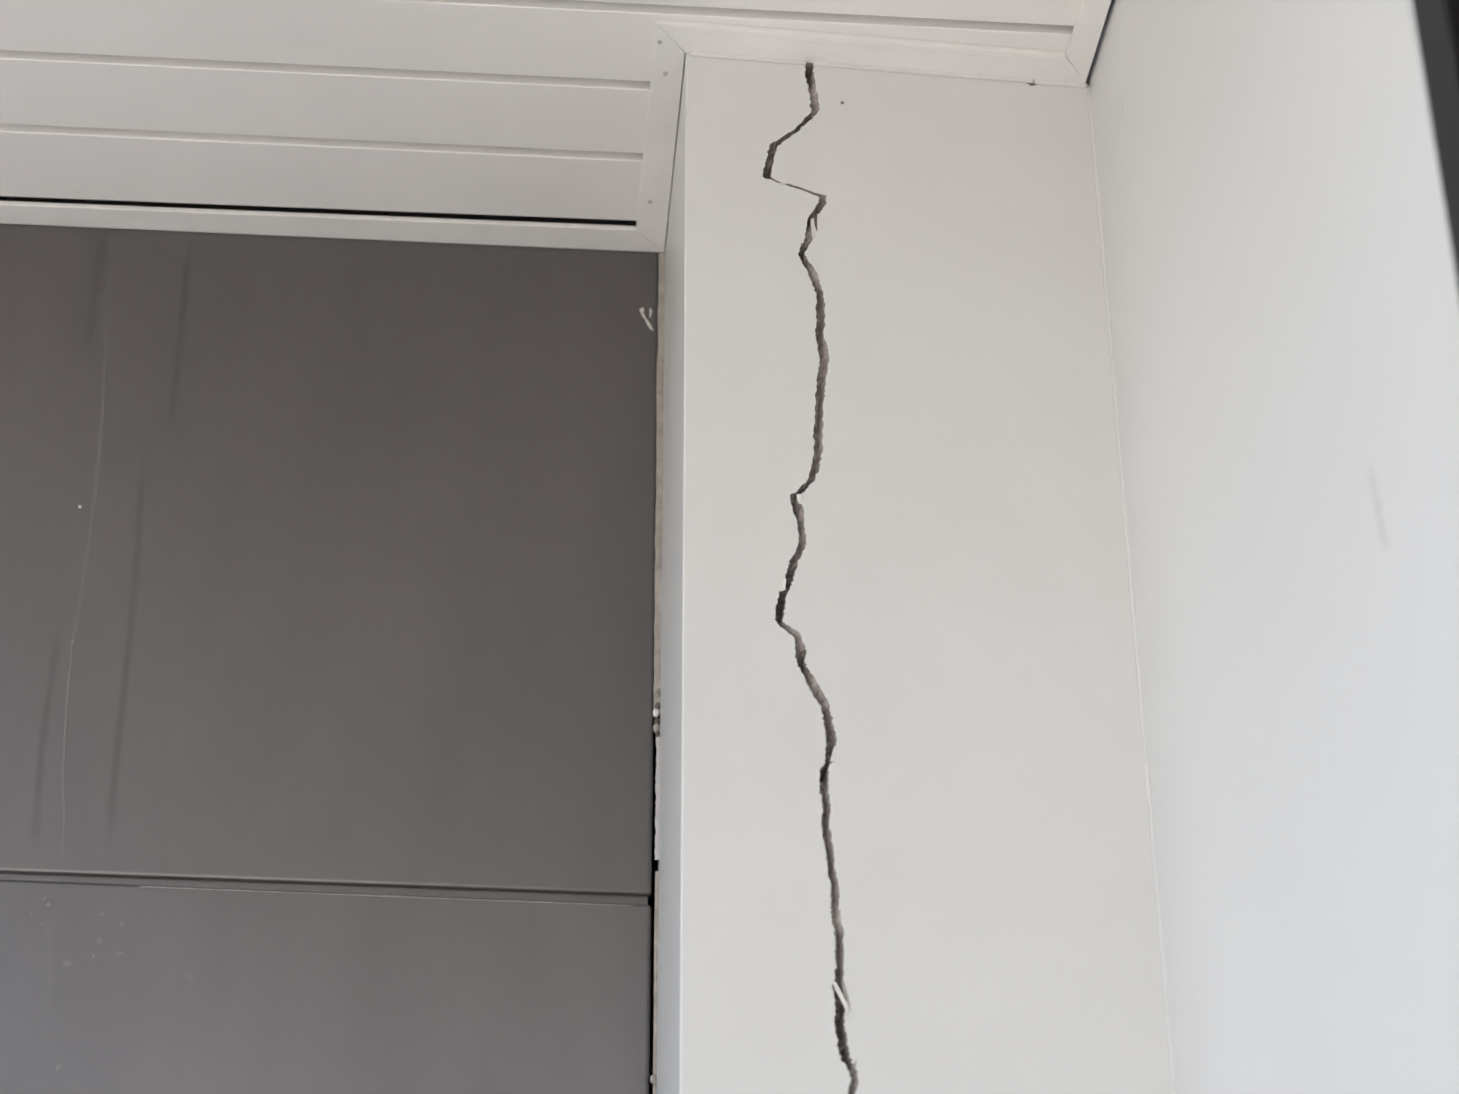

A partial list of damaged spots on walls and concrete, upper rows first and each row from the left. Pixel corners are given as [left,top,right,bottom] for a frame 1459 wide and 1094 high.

crack [763,63,859,1094]